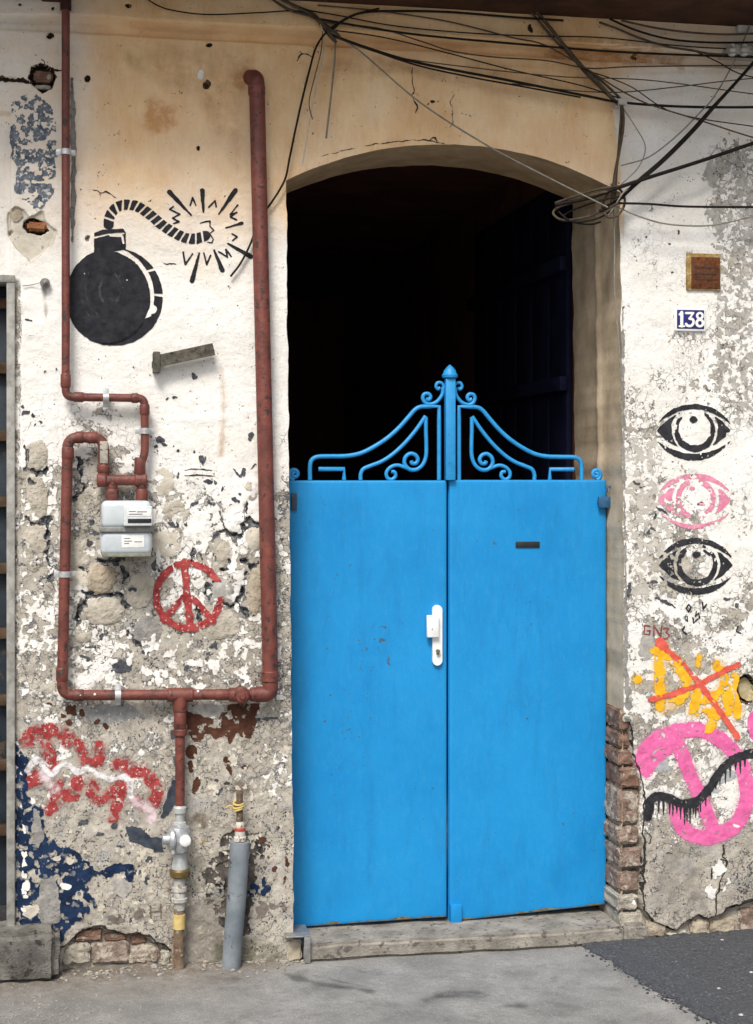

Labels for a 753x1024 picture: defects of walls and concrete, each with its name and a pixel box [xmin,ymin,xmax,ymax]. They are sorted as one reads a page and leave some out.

peeling [7,63,58,263]
peeling [701,139,753,445]
peeling [19,405,59,526]
peeling [151,464,257,576]
peeling [21,571,58,671]
peeling [70,589,262,689]
peeling [188,702,224,717]
spalling [601,306,753,937]
peeling [15,744,290,972]
crack [628,722,753,931]